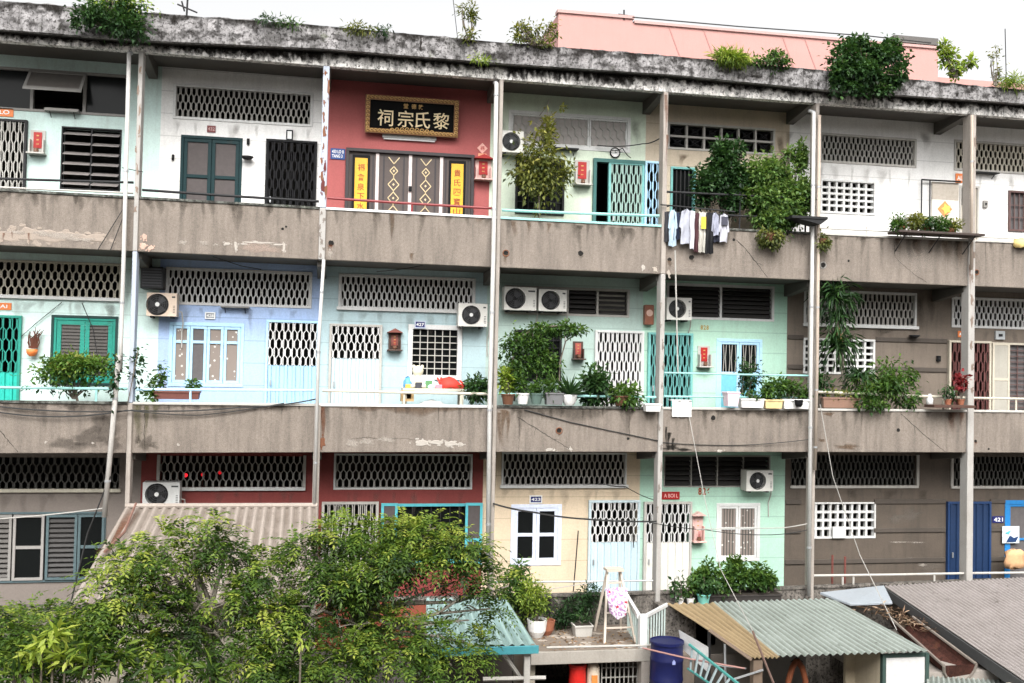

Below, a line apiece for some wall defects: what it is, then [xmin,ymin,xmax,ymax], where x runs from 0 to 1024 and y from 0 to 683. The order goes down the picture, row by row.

damp [0,1,1024,113]
spalling [0,223,116,247]
spalling [138,234,155,252]
peeling [223,241,286,252]
spalling [409,438,466,448]